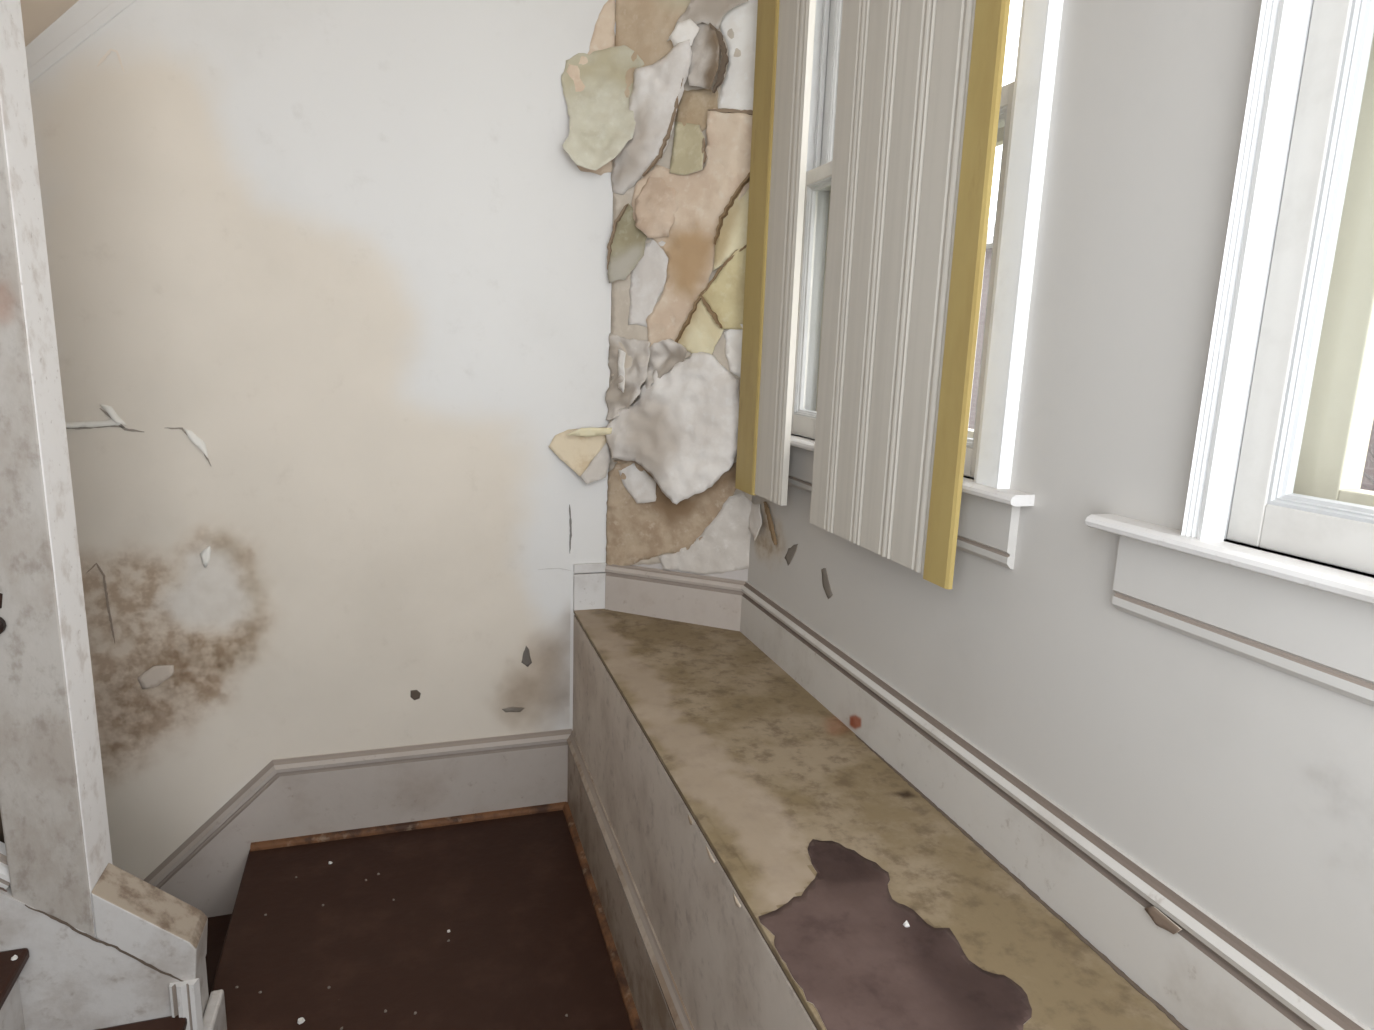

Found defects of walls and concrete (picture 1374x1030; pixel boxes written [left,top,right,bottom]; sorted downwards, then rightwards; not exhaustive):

peeling [549,0,798,574]
damp [87,563,115,643]
damp [138,665,174,689]
peeling [758,839,1032,1030]